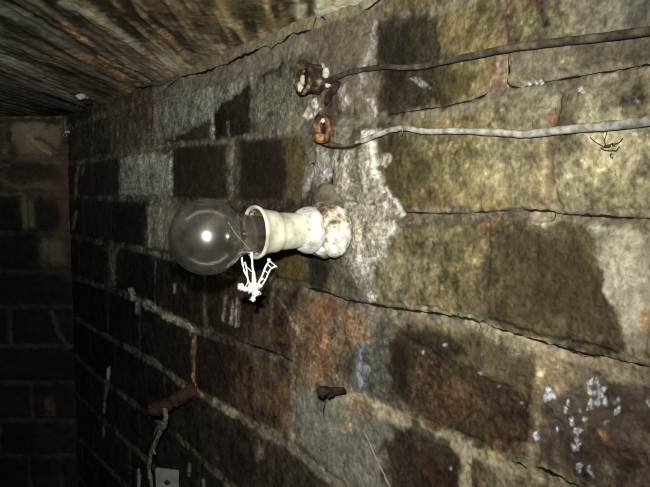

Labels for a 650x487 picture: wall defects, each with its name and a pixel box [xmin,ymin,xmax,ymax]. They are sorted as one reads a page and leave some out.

crack [136,16,326,89]
leakage [302,98,321,119]
leakage [337,84,349,134]
crack [387,91,490,115]
crack [507,57,650,88]
leakage [302,128,404,301]
crack [404,209,650,221]
rust [190,336,204,397]
rust [291,297,372,399]
crack [306,287,650,367]
leakage [542,377,650,478]